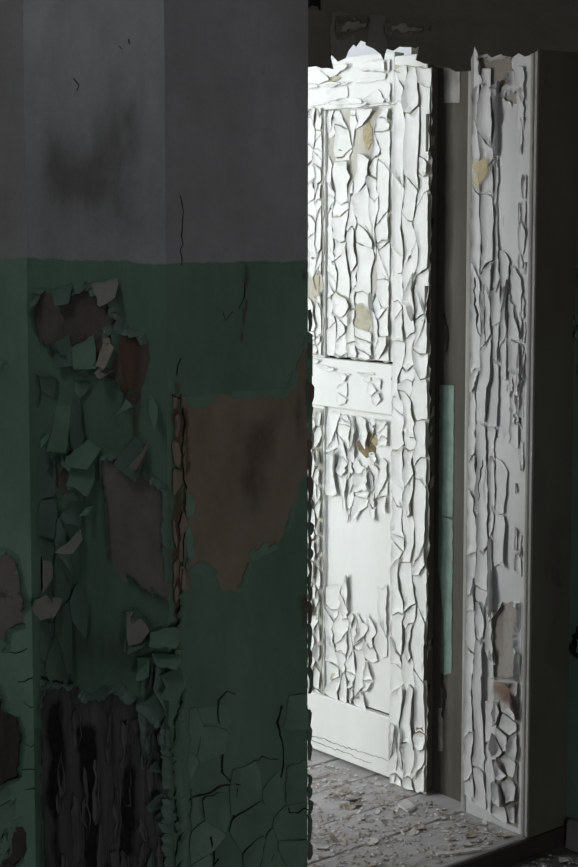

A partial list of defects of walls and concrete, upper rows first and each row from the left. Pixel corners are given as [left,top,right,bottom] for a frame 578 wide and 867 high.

peeling [308,0,538,828]
peeling [0,107,388,867]
damp [46,703,65,865]
damp [77,726,109,867]
damp [121,768,135,857]
crack [188,754,241,801]
crack [210,836,219,867]
crack [217,691,236,724]
crack [253,706,284,778]